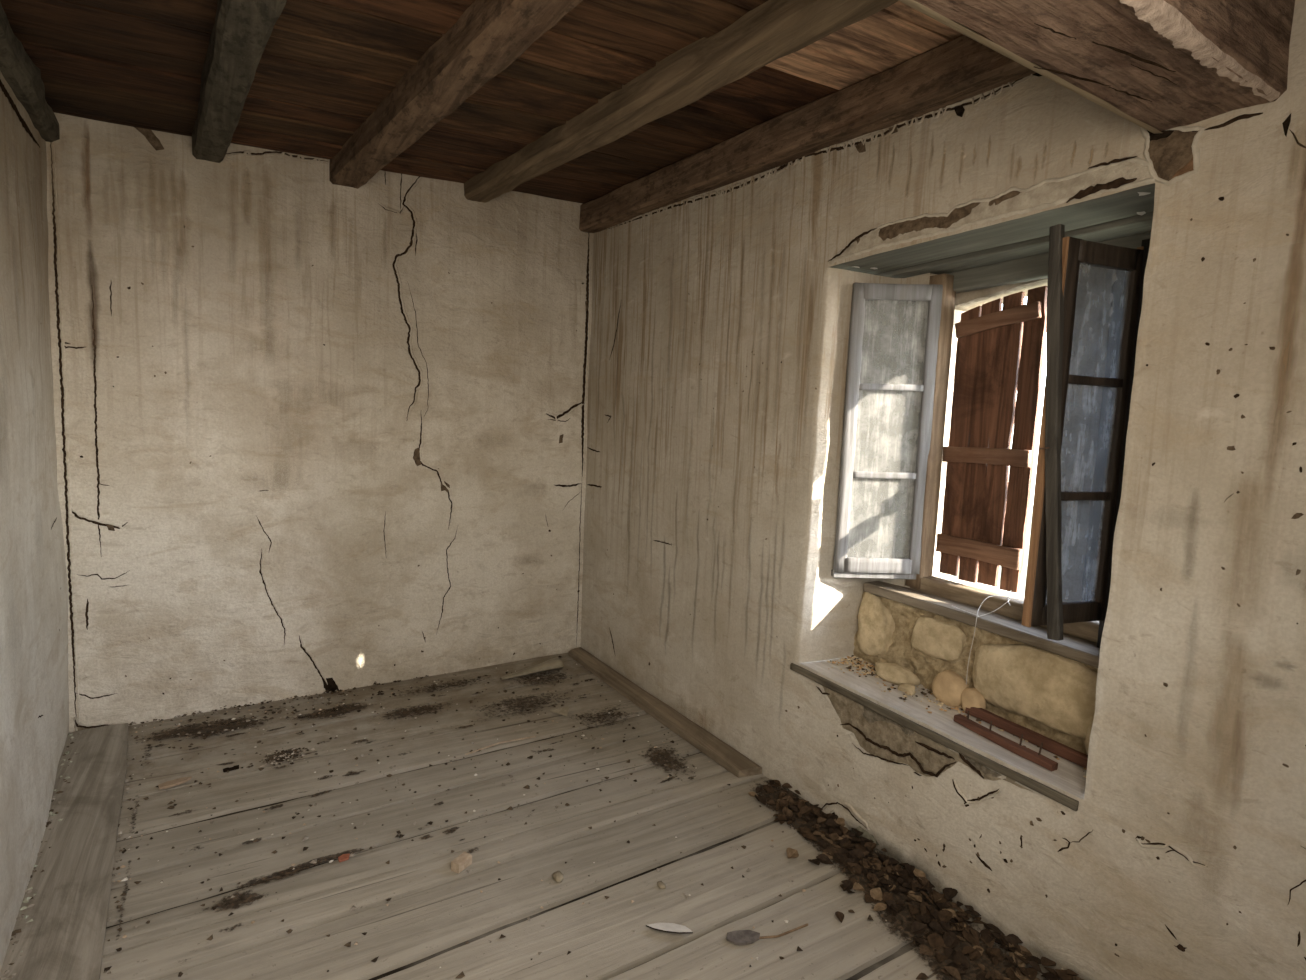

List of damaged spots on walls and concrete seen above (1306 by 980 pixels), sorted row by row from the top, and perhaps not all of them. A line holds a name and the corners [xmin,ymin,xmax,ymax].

flaking render [606,73,1042,232]
flaking render [829,113,1263,269]
crack [0,79,130,722]
crack [378,173,457,634]
crack [256,516,339,693]
flaking render [816,686,1034,793]
flaking render [969,817,1042,871]
crack [1055,830,1093,852]
crack [1135,836,1209,868]
crack [1288,880,1306,960]